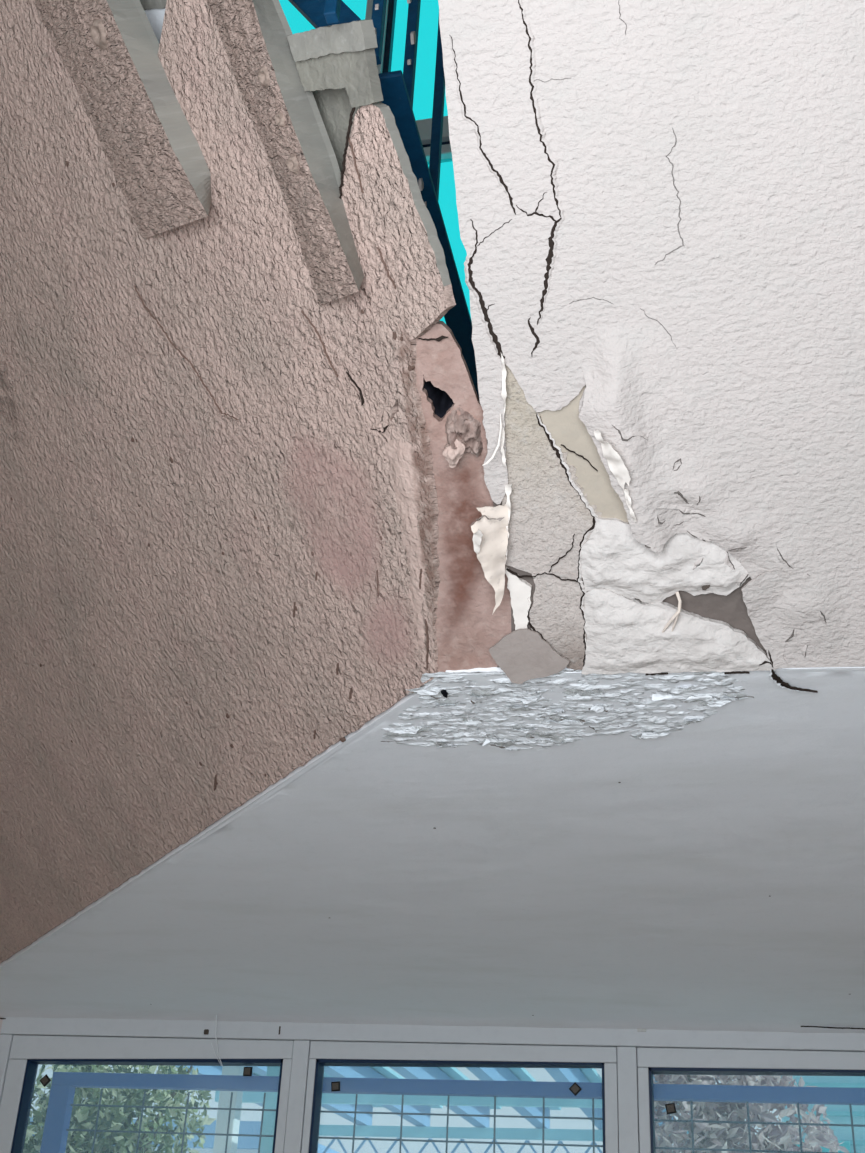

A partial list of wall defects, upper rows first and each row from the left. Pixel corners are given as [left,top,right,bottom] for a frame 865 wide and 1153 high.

crack [449,0,677,359]
crack [655,128,684,265]
crack [133,285,241,422]
crack [301,310,389,433]
crack [418,335,448,343]
damp [453,500,482,610]
crack [506,413,598,666]
spalling [381,353,754,751]
crack [724,650,818,693]